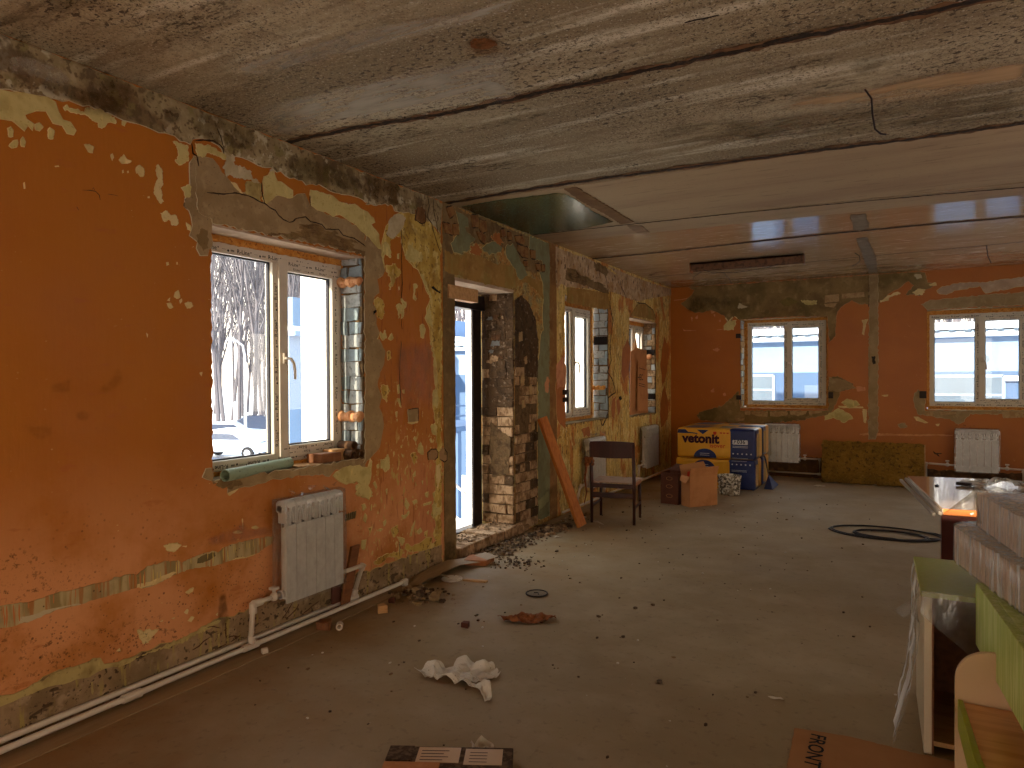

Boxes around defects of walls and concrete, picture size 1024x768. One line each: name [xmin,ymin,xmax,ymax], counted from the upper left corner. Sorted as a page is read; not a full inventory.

crack [191,129,224,166]
crack [207,183,366,247]
flaking render [0,34,1024,598]
peeling [0,519,273,628]
flaking render [0,588,331,747]